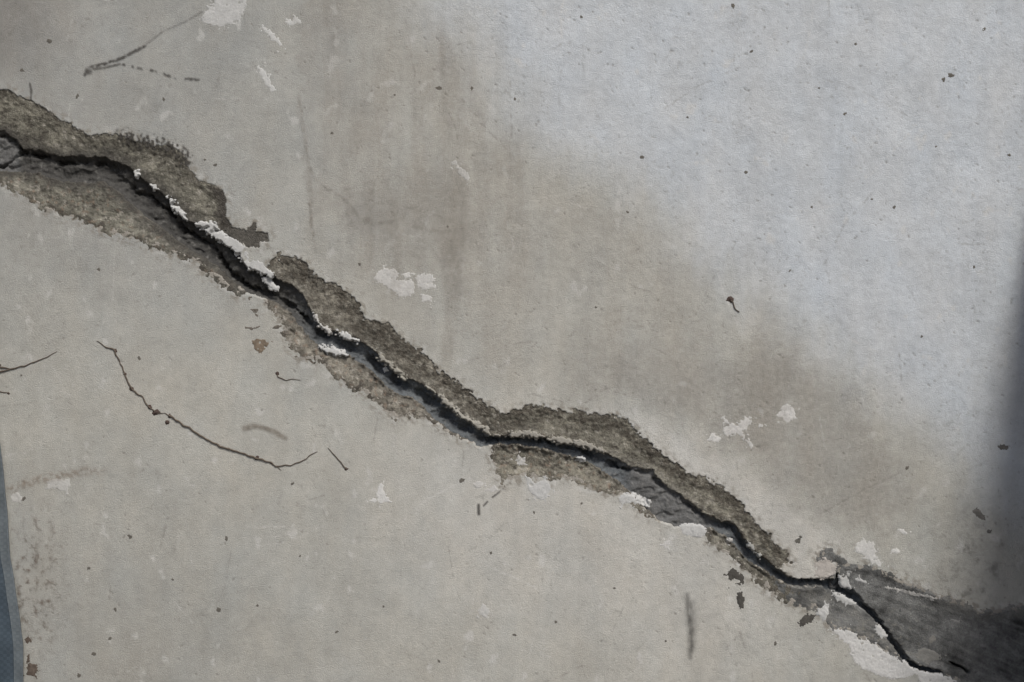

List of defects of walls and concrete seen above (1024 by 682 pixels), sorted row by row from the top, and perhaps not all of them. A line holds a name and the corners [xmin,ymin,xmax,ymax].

spalling [0,89,269,254]
spalling [0,170,467,440]
crack [0,131,963,673]
spalling [267,251,1024,682]
peeling [23,636,39,680]